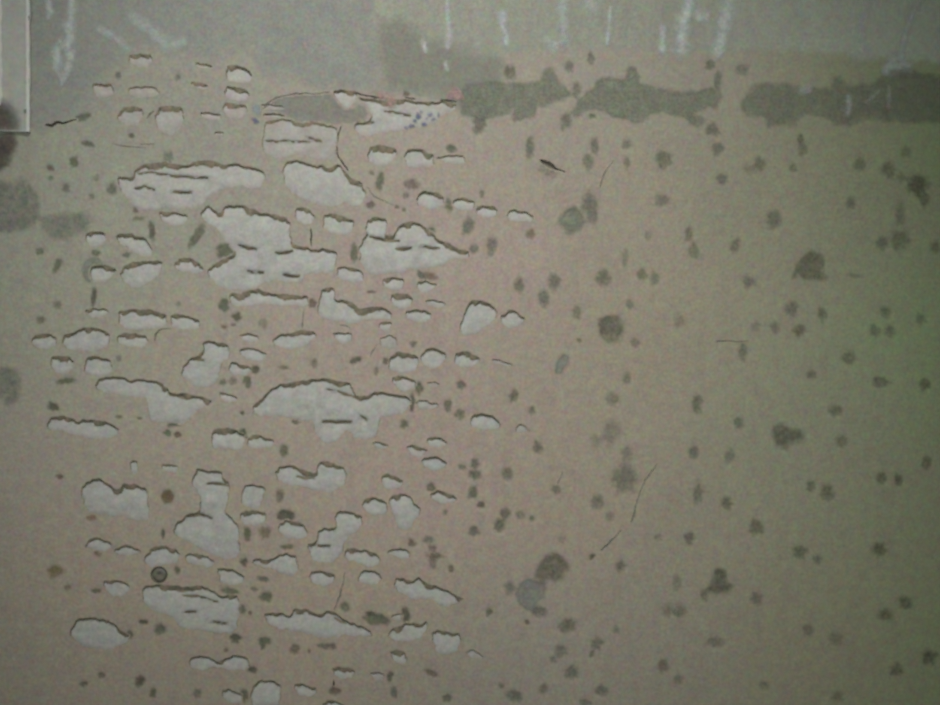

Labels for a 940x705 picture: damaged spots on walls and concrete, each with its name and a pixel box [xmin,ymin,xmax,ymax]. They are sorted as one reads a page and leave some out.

peeling [333,68,569,189]
spalling [31,103,500,449]
spalling [81,428,421,705]
crack [601,464,657,551]
spalling [70,617,133,650]
spalling [261,593,483,697]